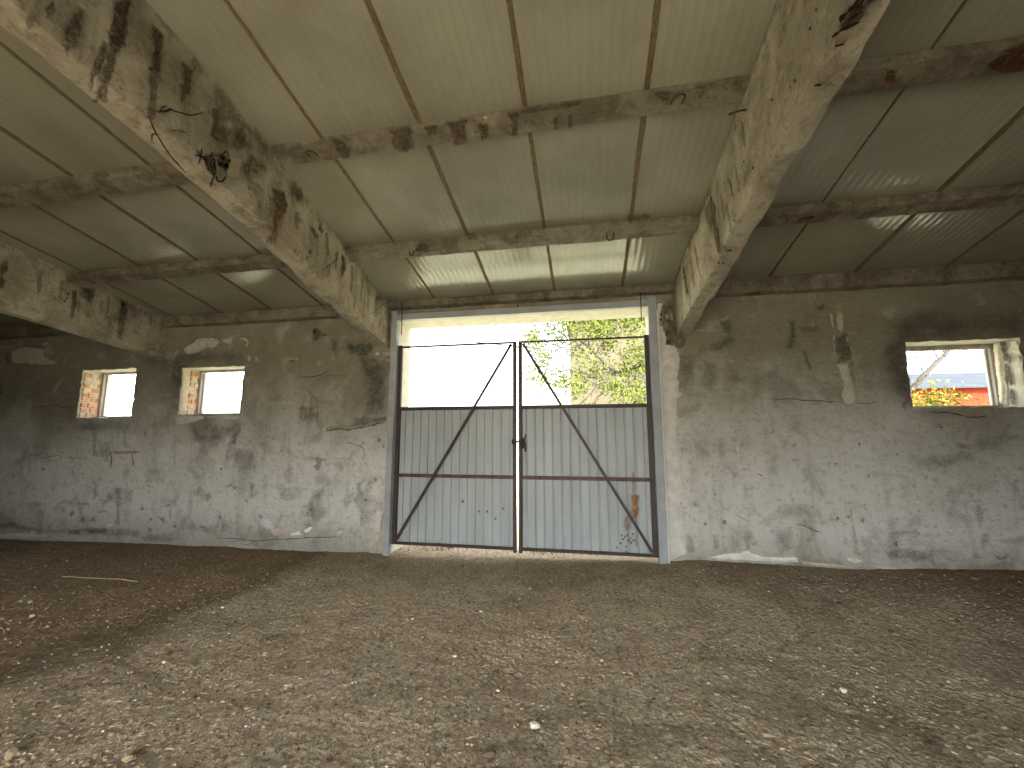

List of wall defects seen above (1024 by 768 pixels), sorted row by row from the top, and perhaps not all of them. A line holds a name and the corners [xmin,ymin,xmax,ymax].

damp [88,1,130,102]
damp [148,26,163,118]
peeling [1,342,55,366]
peeling [172,337,258,362]
spalling [660,306,687,349]
spalling [993,342,1015,406]